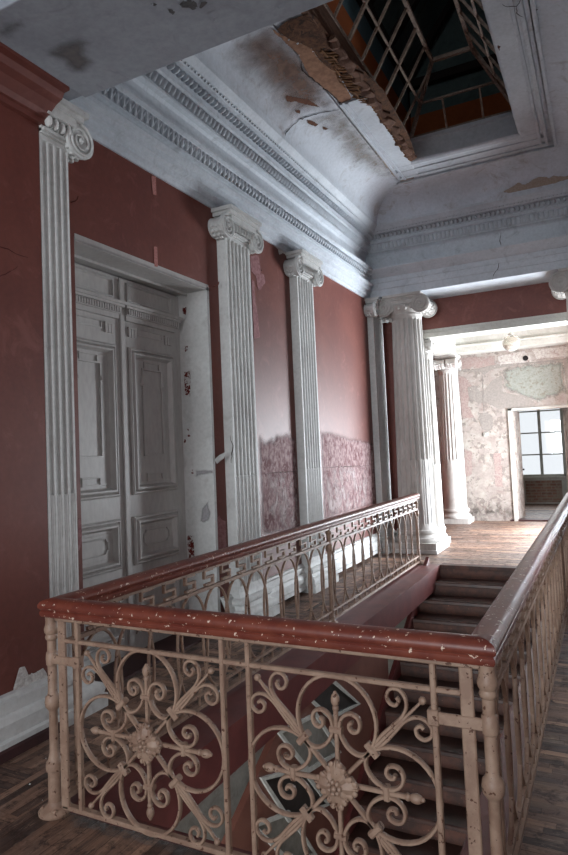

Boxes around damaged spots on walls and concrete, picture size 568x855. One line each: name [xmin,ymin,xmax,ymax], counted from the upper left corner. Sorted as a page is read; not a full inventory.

peeling [168,0,207,15]
damp [52,43,88,70]
flaking render [273,30,353,103]
crack [285,61,342,135]
flaking render [504,176,568,193]
peeling [458,346,568,419]
peeling [464,449,473,477]
flaking render [525,480,563,502]